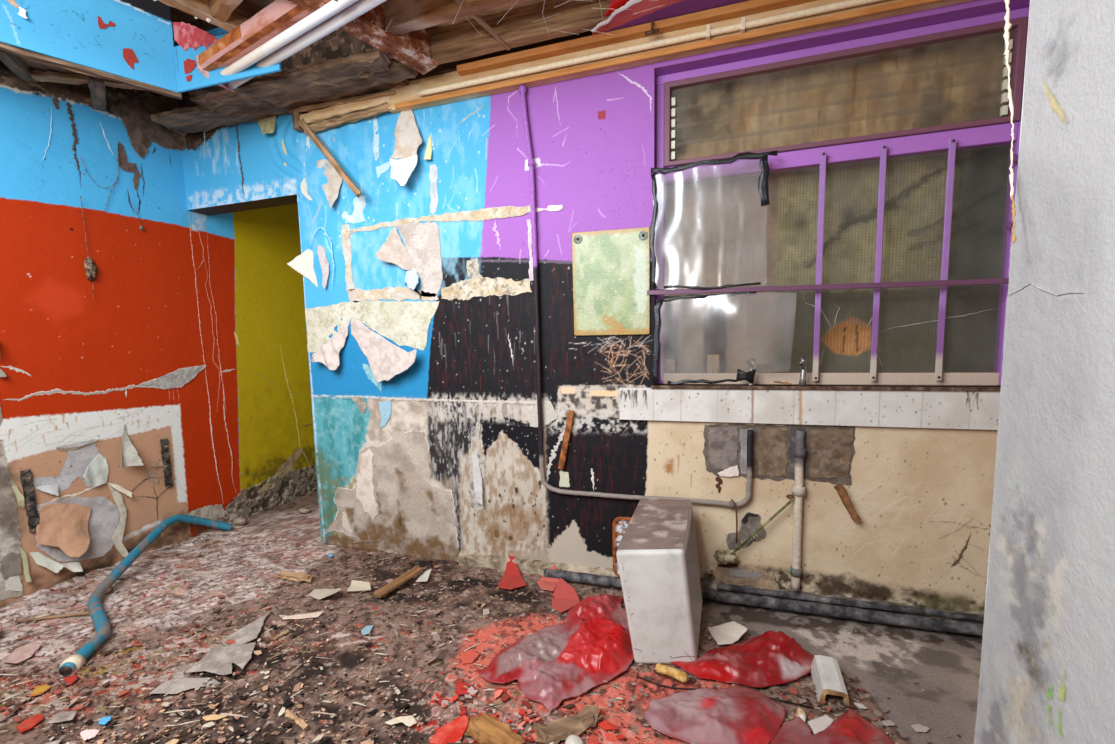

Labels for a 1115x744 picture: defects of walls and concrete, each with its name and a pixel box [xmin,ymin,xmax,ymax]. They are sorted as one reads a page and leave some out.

peeling [7,0,28,19]
peeling [97,16,115,29]
peeling [123,48,139,69]
peeling [173,22,219,82]
flaking render [110,94,199,190]
flaking render [301,116,563,302]
peeling [528,400,558,427]
flaking render [325,364,459,562]
peeling [468,419,486,510]
flaking render [0,407,24,600]
water stain [819,577,892,599]